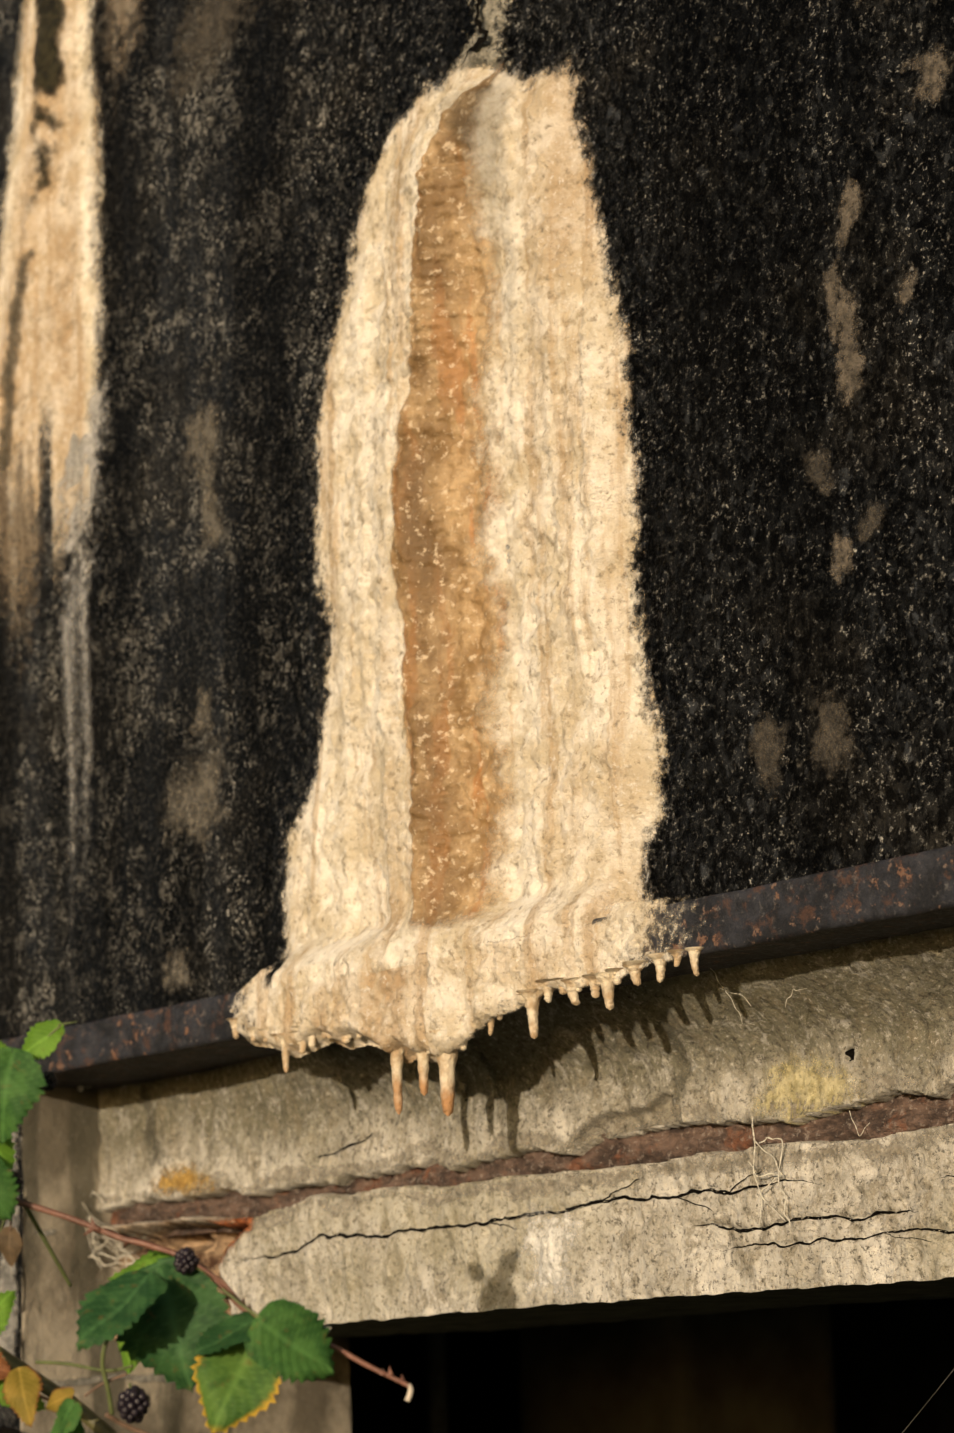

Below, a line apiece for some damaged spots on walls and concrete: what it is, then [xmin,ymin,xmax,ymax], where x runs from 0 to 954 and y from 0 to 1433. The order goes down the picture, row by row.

crack [452,0,513,72]
water stain [0,0,141,805]
water stain [226,37,704,1116]
spalling [96,1073,954,1316]
crack [235,1171,954,1265]